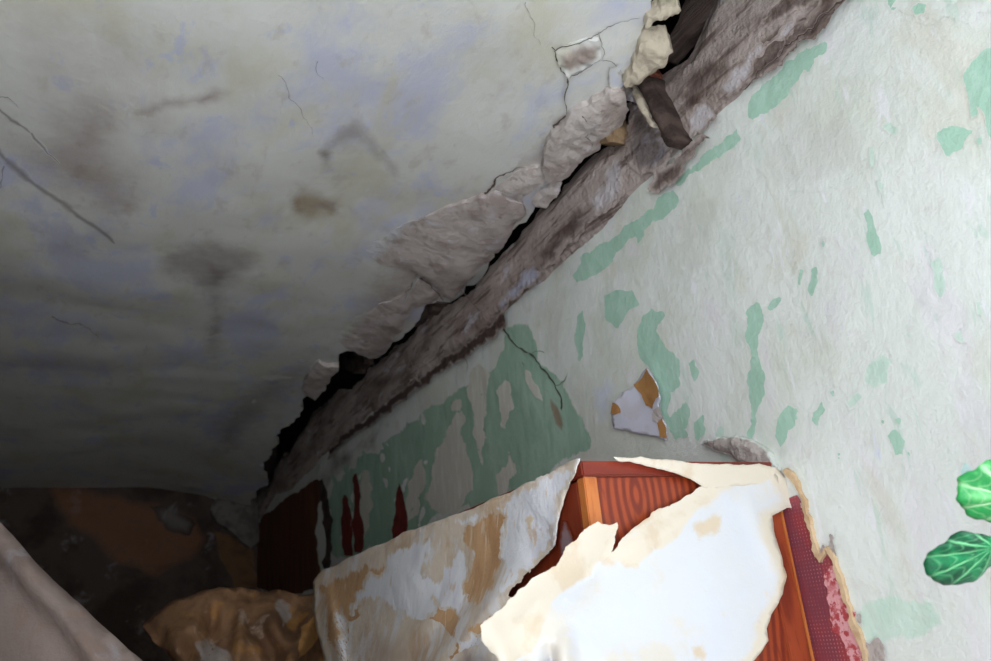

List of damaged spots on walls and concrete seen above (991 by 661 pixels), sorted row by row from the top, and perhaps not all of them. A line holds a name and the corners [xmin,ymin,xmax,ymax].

crack [0,96,60,164]
crack [0,145,115,244]
damp [0,67,276,367]
damp [277,111,406,231]
damp [379,80,610,240]
crack [524,2,639,147]
peeling [567,35,832,284]
damp [197,259,422,469]
crack [329,276,567,454]
peeling [324,310,596,564]
peeling [603,289,725,443]
spalling [782,468,947,661]